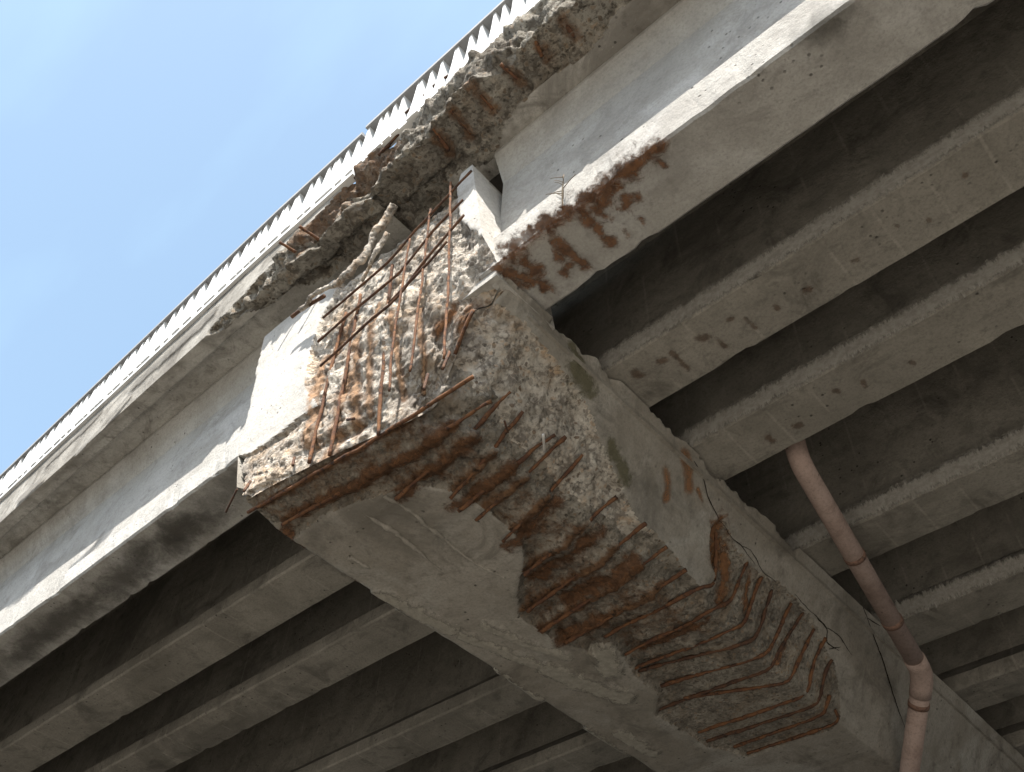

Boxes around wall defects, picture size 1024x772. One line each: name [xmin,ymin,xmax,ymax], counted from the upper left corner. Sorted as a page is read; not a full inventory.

corrosion [490,137,669,294]
corrosion [303,307,404,458]
corrosion [436,305,471,335]
spalling [210,0,841,757]
corrosion [280,420,483,548]
corrosion [445,459,519,511]
corrosion [500,496,563,553]
corrosion [527,524,607,580]
corrosion [709,514,731,605]
crack [694,461,852,655]